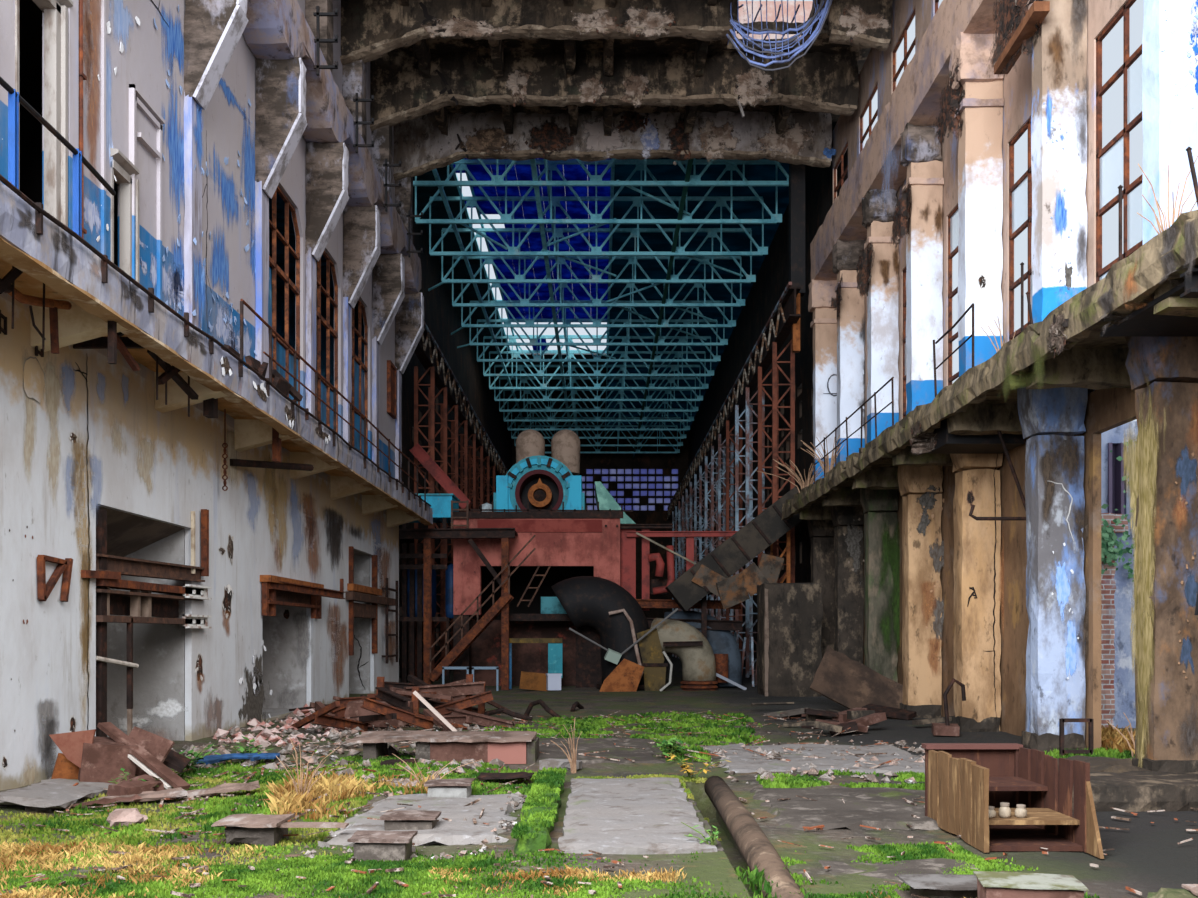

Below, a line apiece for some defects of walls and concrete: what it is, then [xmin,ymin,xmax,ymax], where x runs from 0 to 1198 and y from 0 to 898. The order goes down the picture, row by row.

corrosion [83,0,100,164]
spalling [422,15,503,38]
spalling [571,7,676,37]
spalling [525,74,740,165]
spalling [726,0,890,109]
damp [1072,0,1087,40]
damp [1079,85,1087,158]
peeling [98,0,257,376]
damp [1077,229,1086,269]
damp [24,363,75,508]
peeling [1052,543,1079,679]
damp [38,701,57,778]